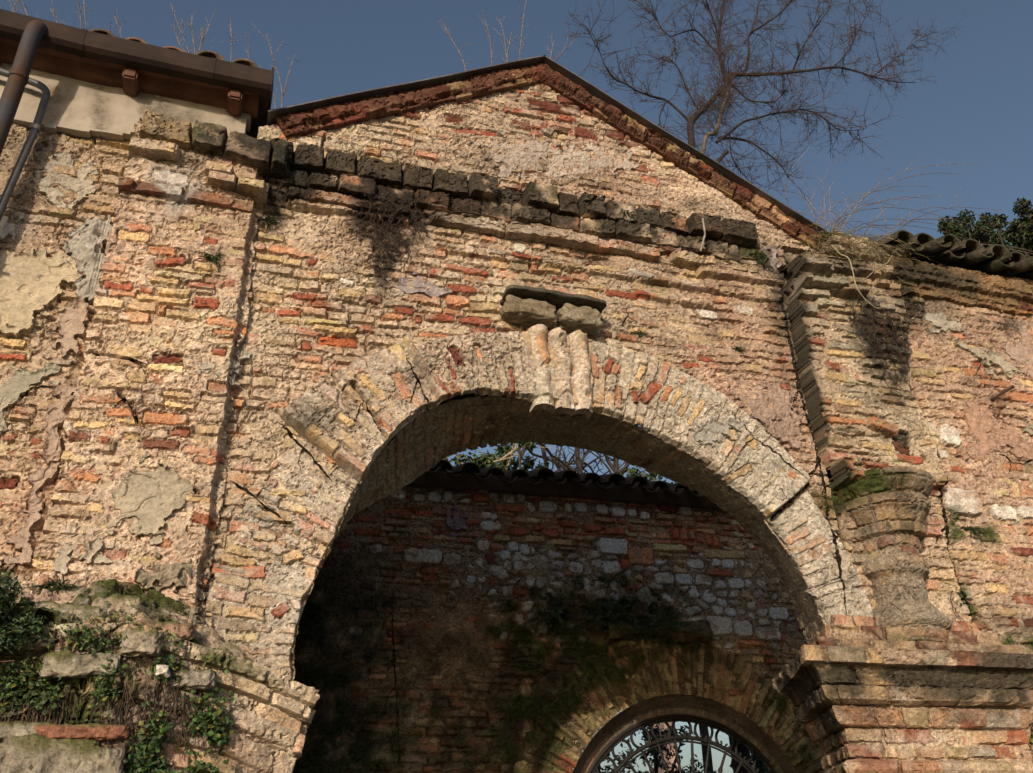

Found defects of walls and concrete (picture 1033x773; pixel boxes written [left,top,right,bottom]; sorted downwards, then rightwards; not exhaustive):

flaking render [33,151,100,226]
leakage [350,177,428,281]
leakage [856,294,918,376]
flaking render [921,312,1033,381]
flaking render [0,211,90,572]
crack [113,392,138,424]
crack [278,422,331,480]
crack [406,358,431,415]
crack [732,273,847,615]
flaking render [954,399,1033,462]
peeling [54,439,218,575]
crack [230,480,291,525]